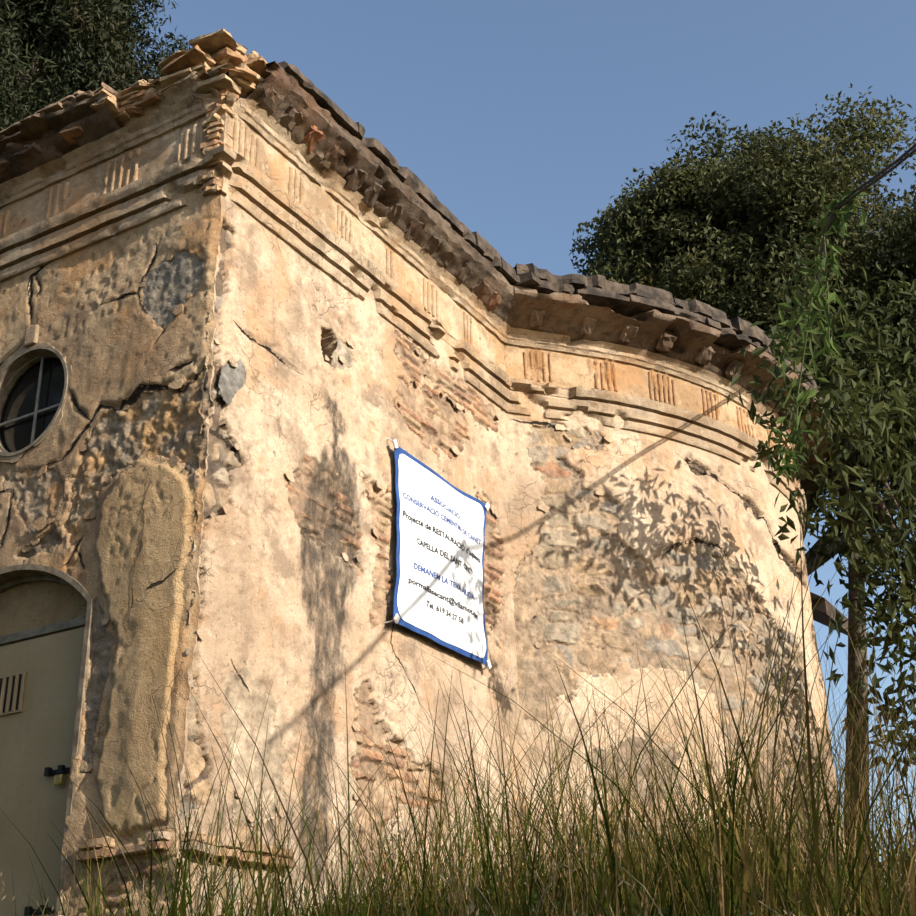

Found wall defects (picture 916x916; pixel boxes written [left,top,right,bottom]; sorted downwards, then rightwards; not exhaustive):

crack [0,266,45,366]
spalling [2,226,246,558]
crack [47,359,205,465]
crack [103,243,157,314]
spalling [394,330,500,460]
crack [0,486,15,548]
crack [128,482,178,623]
water stain [300,400,359,879]
spalling [285,455,393,631]
spalling [473,421,843,869]
flaking render [76,647,294,916]
spalling [349,681,443,881]